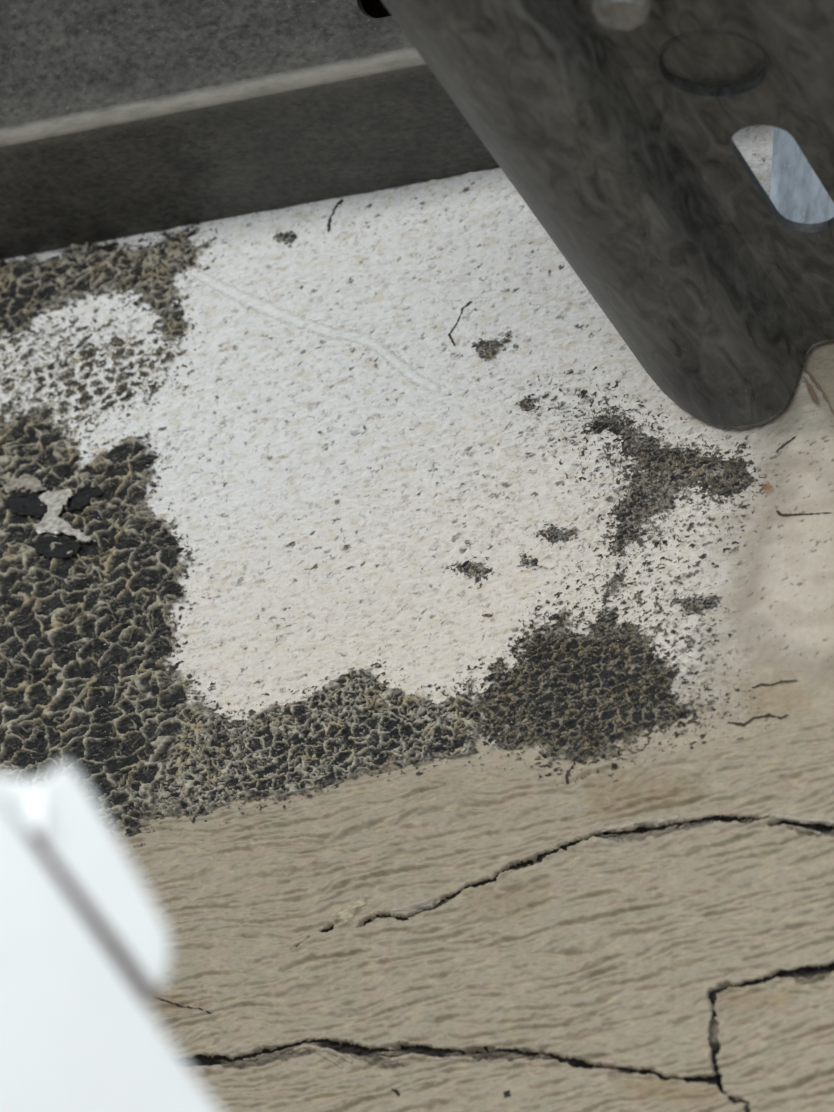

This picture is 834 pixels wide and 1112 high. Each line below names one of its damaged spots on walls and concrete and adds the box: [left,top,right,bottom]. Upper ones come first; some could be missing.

water stain [0,223,781,847]
crack [363,813,834,926]
crack [182,963,834,1112]